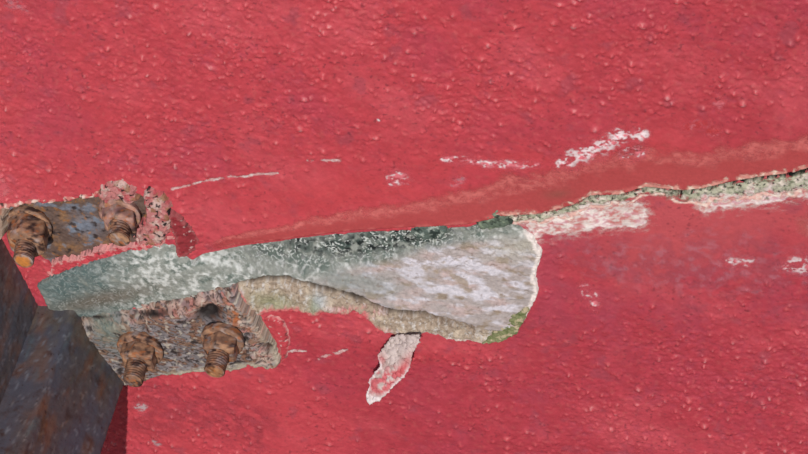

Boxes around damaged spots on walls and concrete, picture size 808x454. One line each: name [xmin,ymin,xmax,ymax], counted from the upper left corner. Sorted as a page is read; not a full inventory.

crack [496,165,808,225]
peeling [698,176,808,213]
spalling [0,179,648,405]